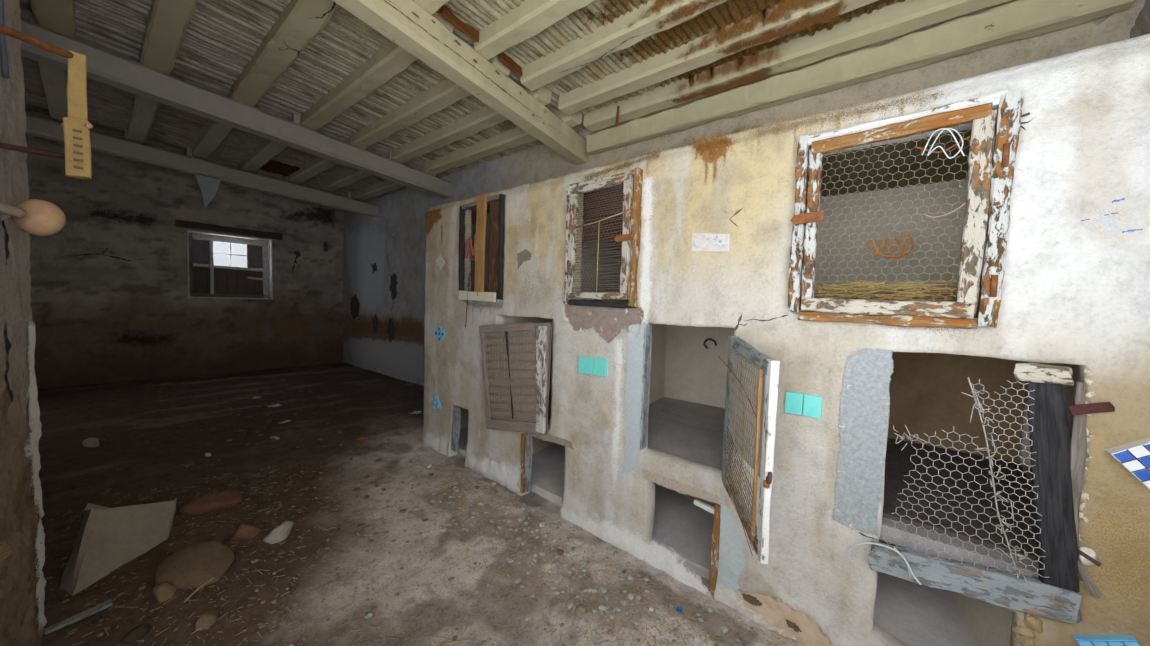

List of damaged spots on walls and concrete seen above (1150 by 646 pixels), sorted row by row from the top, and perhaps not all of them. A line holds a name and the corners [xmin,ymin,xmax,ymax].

corrosion [625,0,735,33]
corrosion [665,0,851,104]
corrosion [686,132,740,184]
spalling [371,263,398,302]
peeling [563,302,831,646]